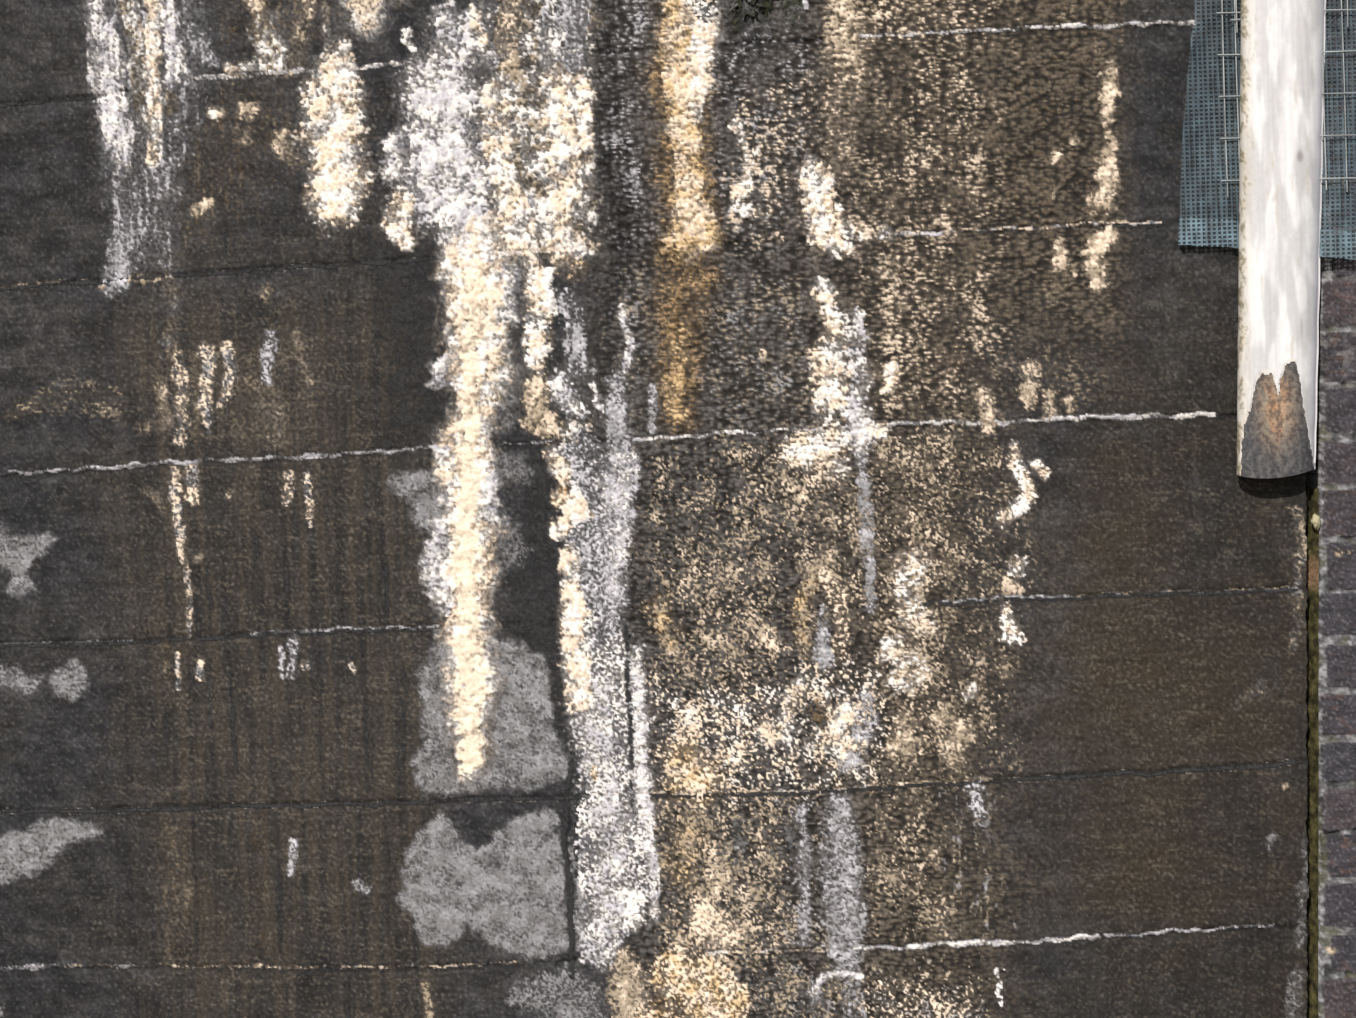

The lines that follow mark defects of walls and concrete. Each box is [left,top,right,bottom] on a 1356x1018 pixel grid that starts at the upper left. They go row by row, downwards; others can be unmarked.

damp [728,119,768,218]
damp [797,156,884,259]
damp [1052,61,1121,292]
damp [1016,361,1075,421]
damp [85,0,661,970]
damp [778,276,938,696]
damp [996,443,1050,528]
damp [998,554,1028,679]
damp [756,678,918,772]
damp [931,682,990,766]
damp [782,791,867,1018]
damp [994,967,1005,1007]